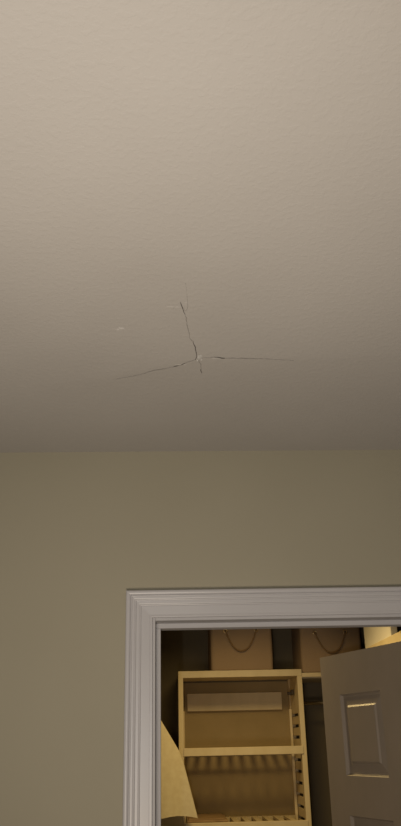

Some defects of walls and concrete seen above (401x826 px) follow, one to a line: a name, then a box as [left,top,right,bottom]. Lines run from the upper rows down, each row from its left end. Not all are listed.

crack [119,283,293,379]